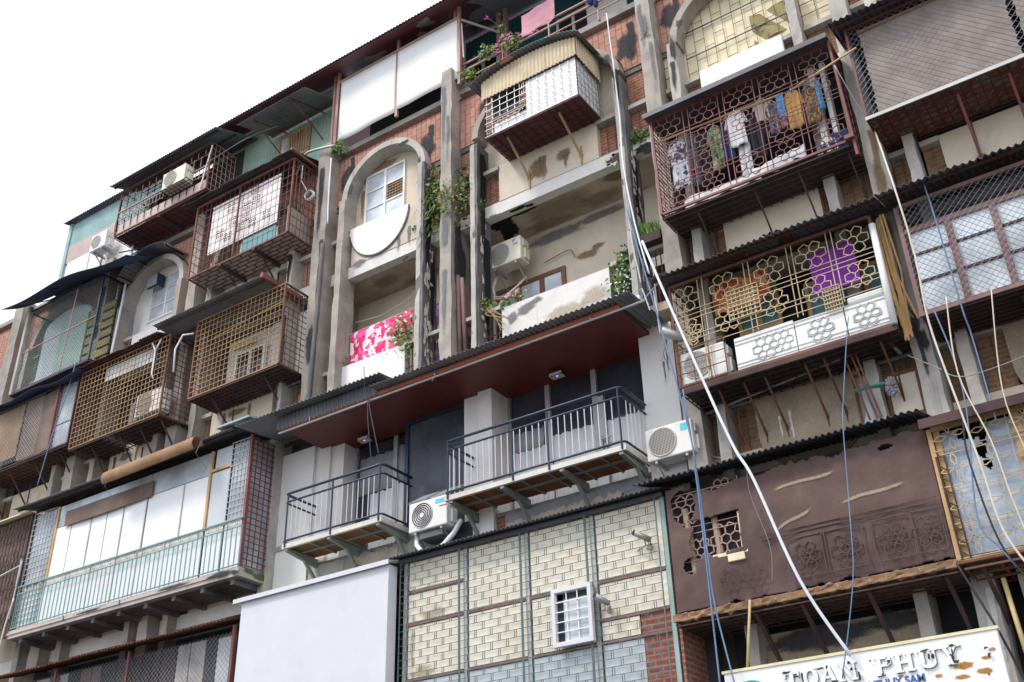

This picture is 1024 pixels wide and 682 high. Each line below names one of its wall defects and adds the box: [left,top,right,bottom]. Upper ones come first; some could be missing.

damp [480,142,652,341]
peeling [402,250,433,365]
corrosion [954,647,996,679]